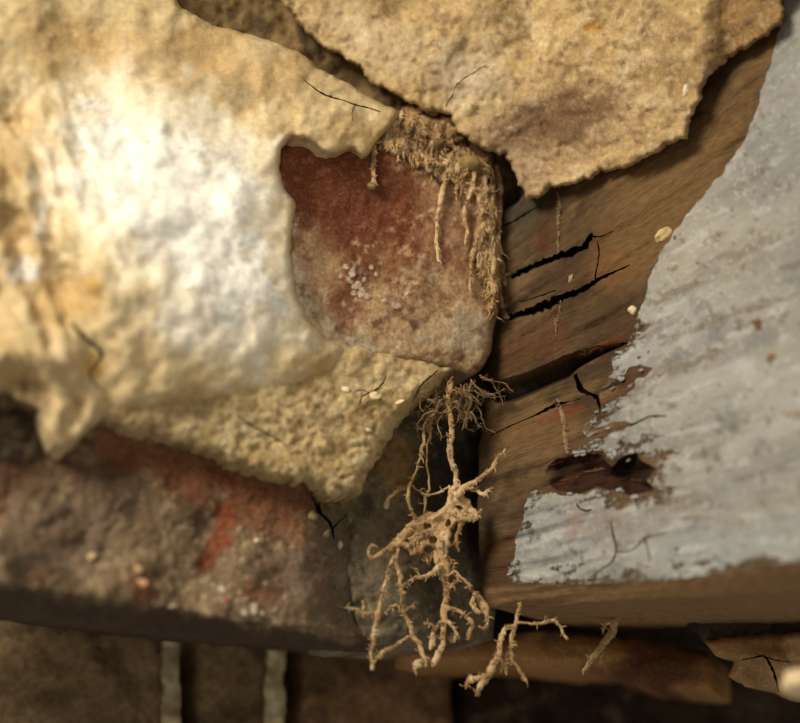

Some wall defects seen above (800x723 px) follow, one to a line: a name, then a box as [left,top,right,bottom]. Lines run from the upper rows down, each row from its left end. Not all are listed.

crack [304,80,381,121]
crack [446,66,489,107]
crack [507,231,630,320]
crack [483,342,666,436]
crack [309,491,346,540]
crack [742,655,790,692]